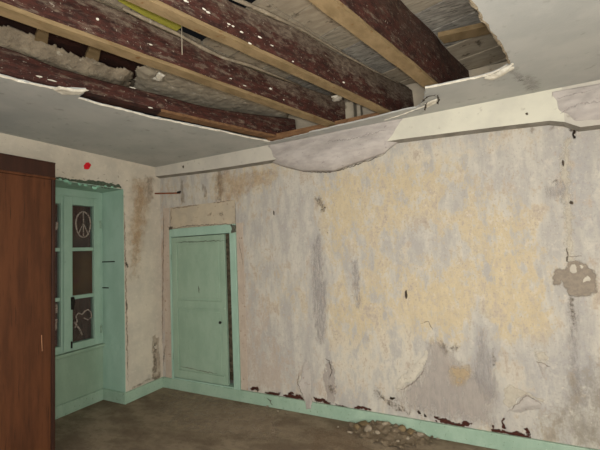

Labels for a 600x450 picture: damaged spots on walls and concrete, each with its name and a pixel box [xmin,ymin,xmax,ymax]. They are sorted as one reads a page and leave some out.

spalling [0,75,270,142]
spalling [0,25,289,118]
spalling [385,0,514,120]
spalling [553,248,597,317]